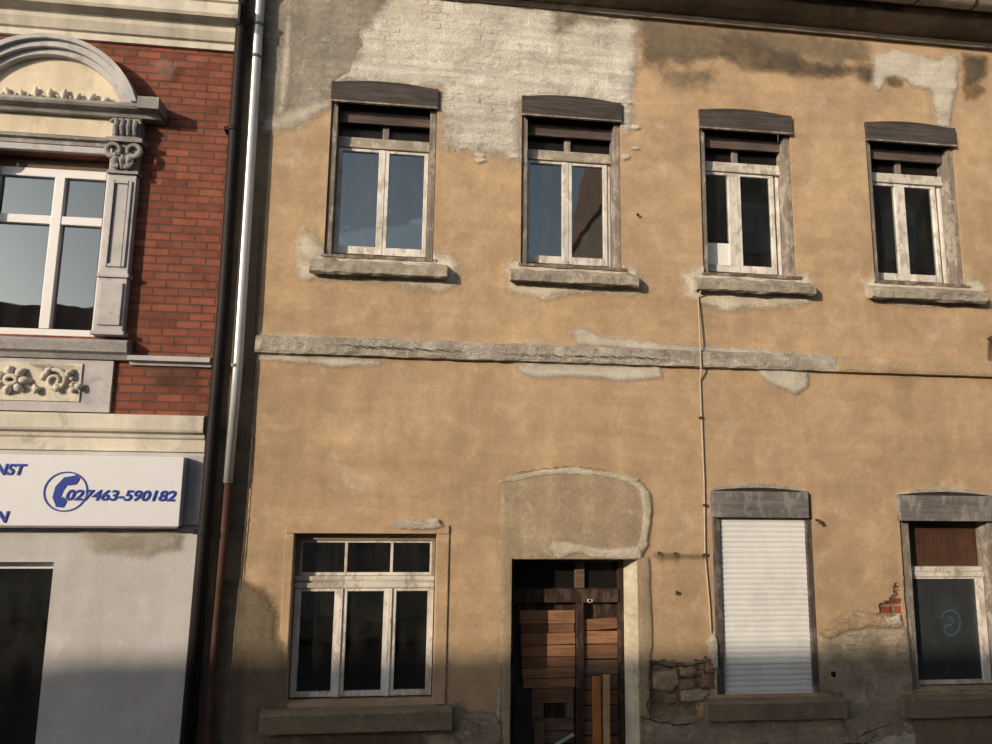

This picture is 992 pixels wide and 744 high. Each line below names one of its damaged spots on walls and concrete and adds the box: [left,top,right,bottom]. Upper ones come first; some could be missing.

water stain [642,20,874,85]
water stain [213,580,461,744]
flaking render [640,582,992,744]
flaking render [452,707,503,744]
crack [844,723,892,744]